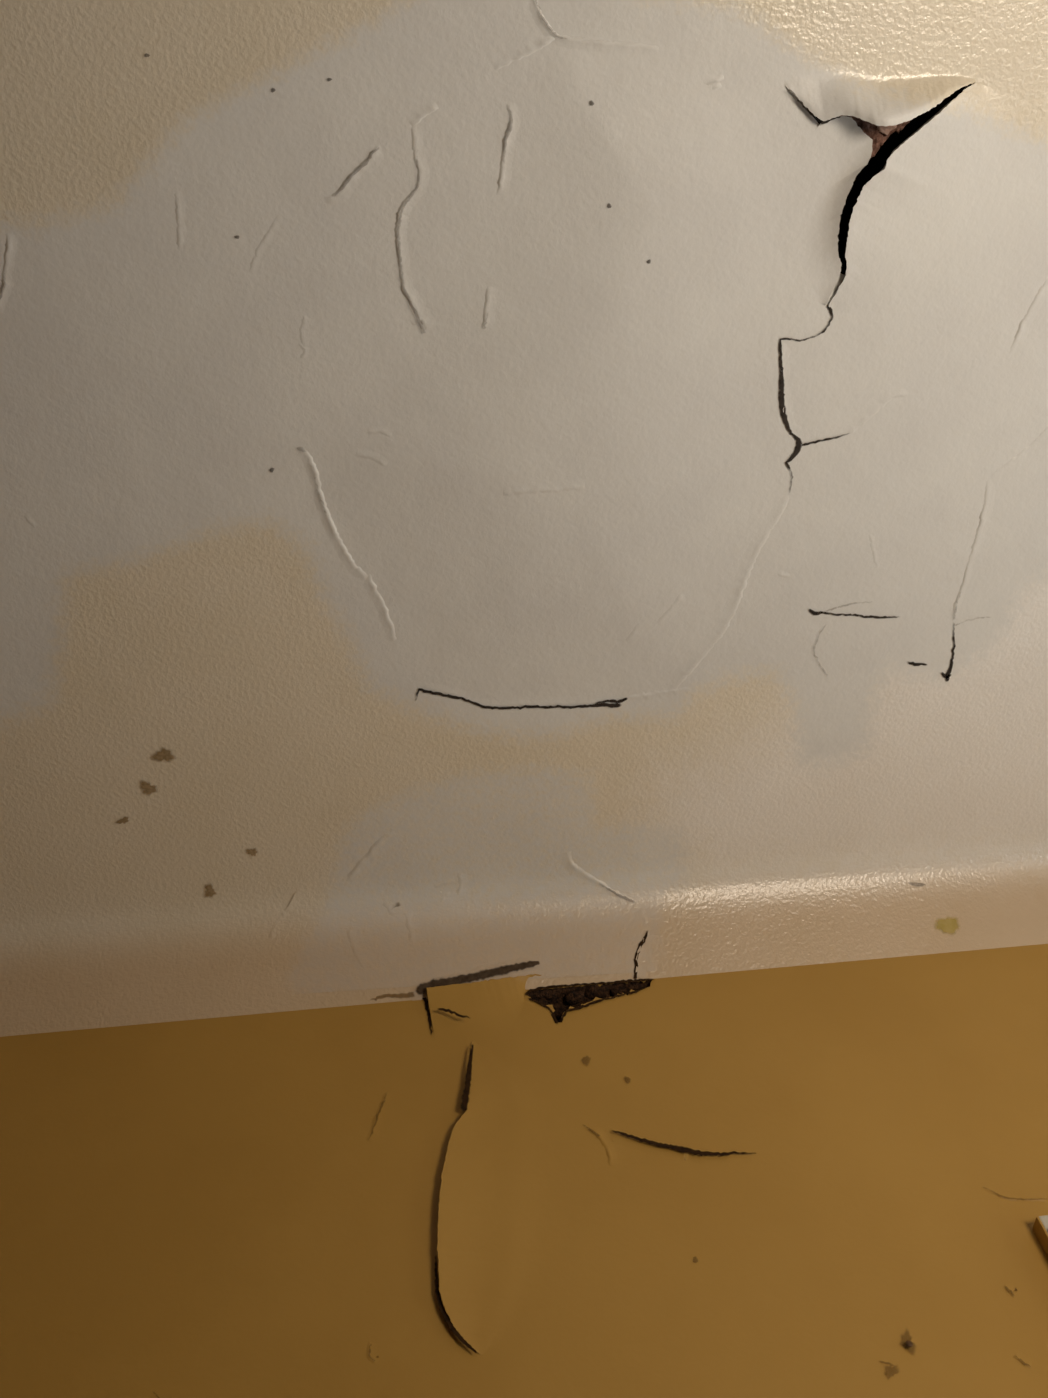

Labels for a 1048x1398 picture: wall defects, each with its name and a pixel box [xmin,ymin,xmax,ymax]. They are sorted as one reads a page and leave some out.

spalling [838,84,972,275]
crack [809,609,897,619]
crack [908,624,956,681]
crack [416,681,692,710]
leakage [937,919,958,933]
peeling [374,929,656,1356]
crack [587,1122,756,1166]